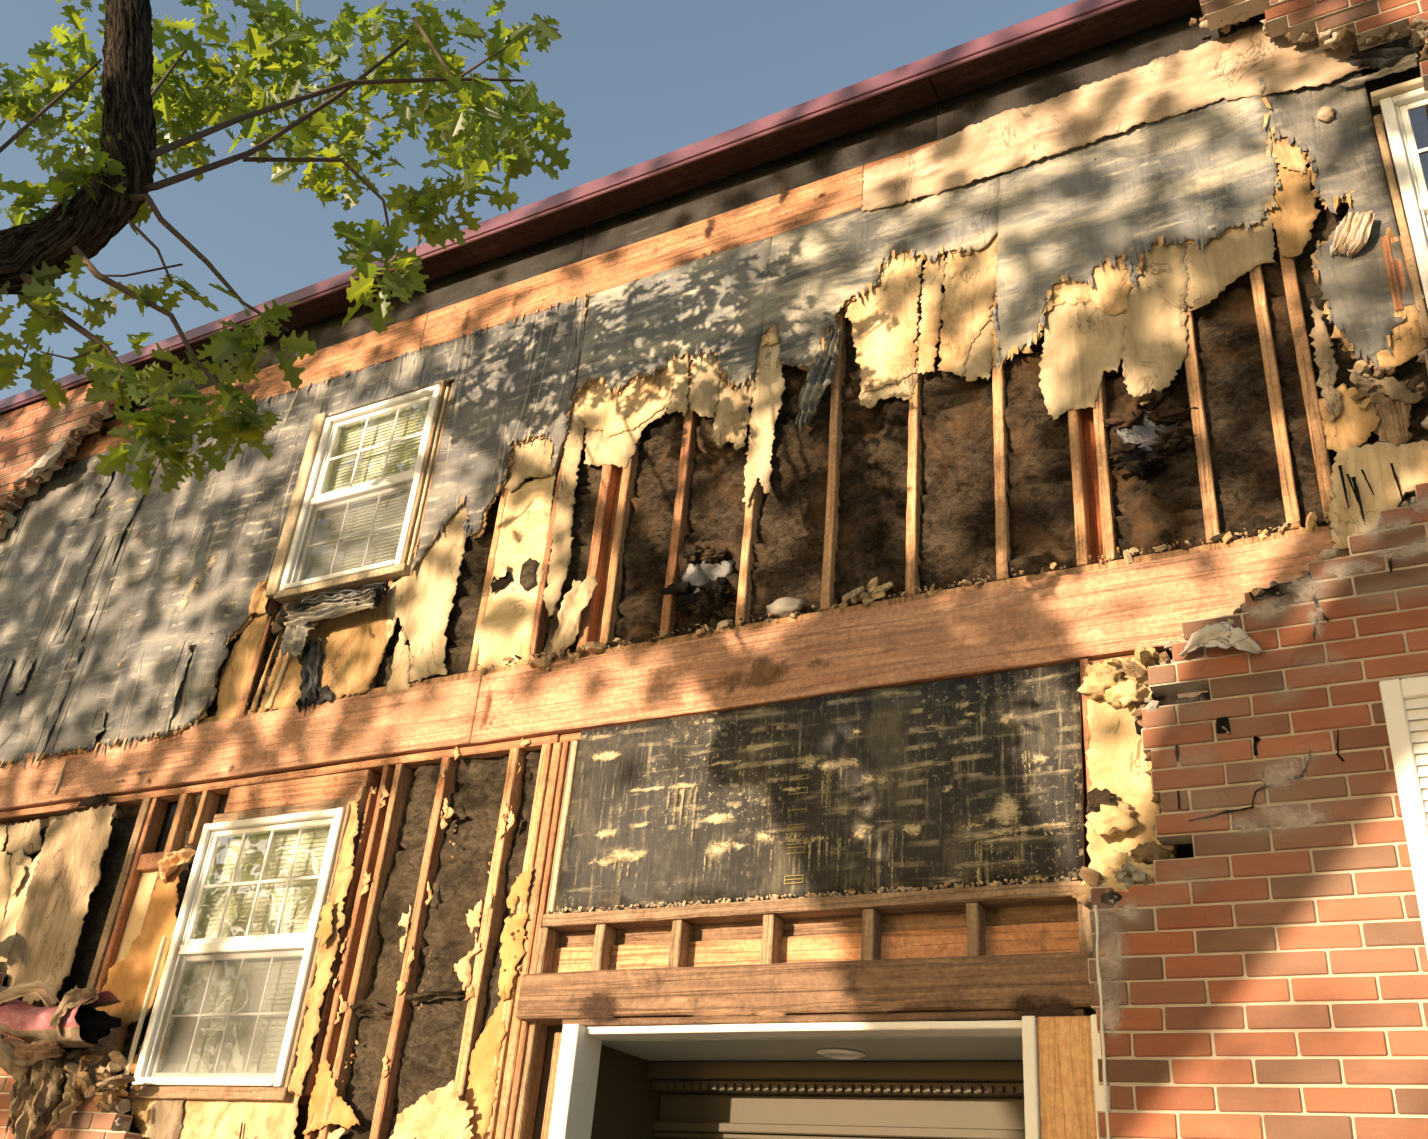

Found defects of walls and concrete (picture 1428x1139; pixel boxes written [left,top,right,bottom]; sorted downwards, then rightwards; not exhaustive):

peeling [844,235,998,409]
peeling [1039,132,1321,420]
peeling [503,320,786,617]
peeling [1309,298,1428,560]
peeling [214,501,468,720]
peeling [0,804,117,1005]
peeling [110,797,360,1139]
water stain [593,751,619,760]
water stain [592,829,646,876]
water stain [631,783,733,837]
water stain [704,755,921,871]
crack [1175,729,1345,822]